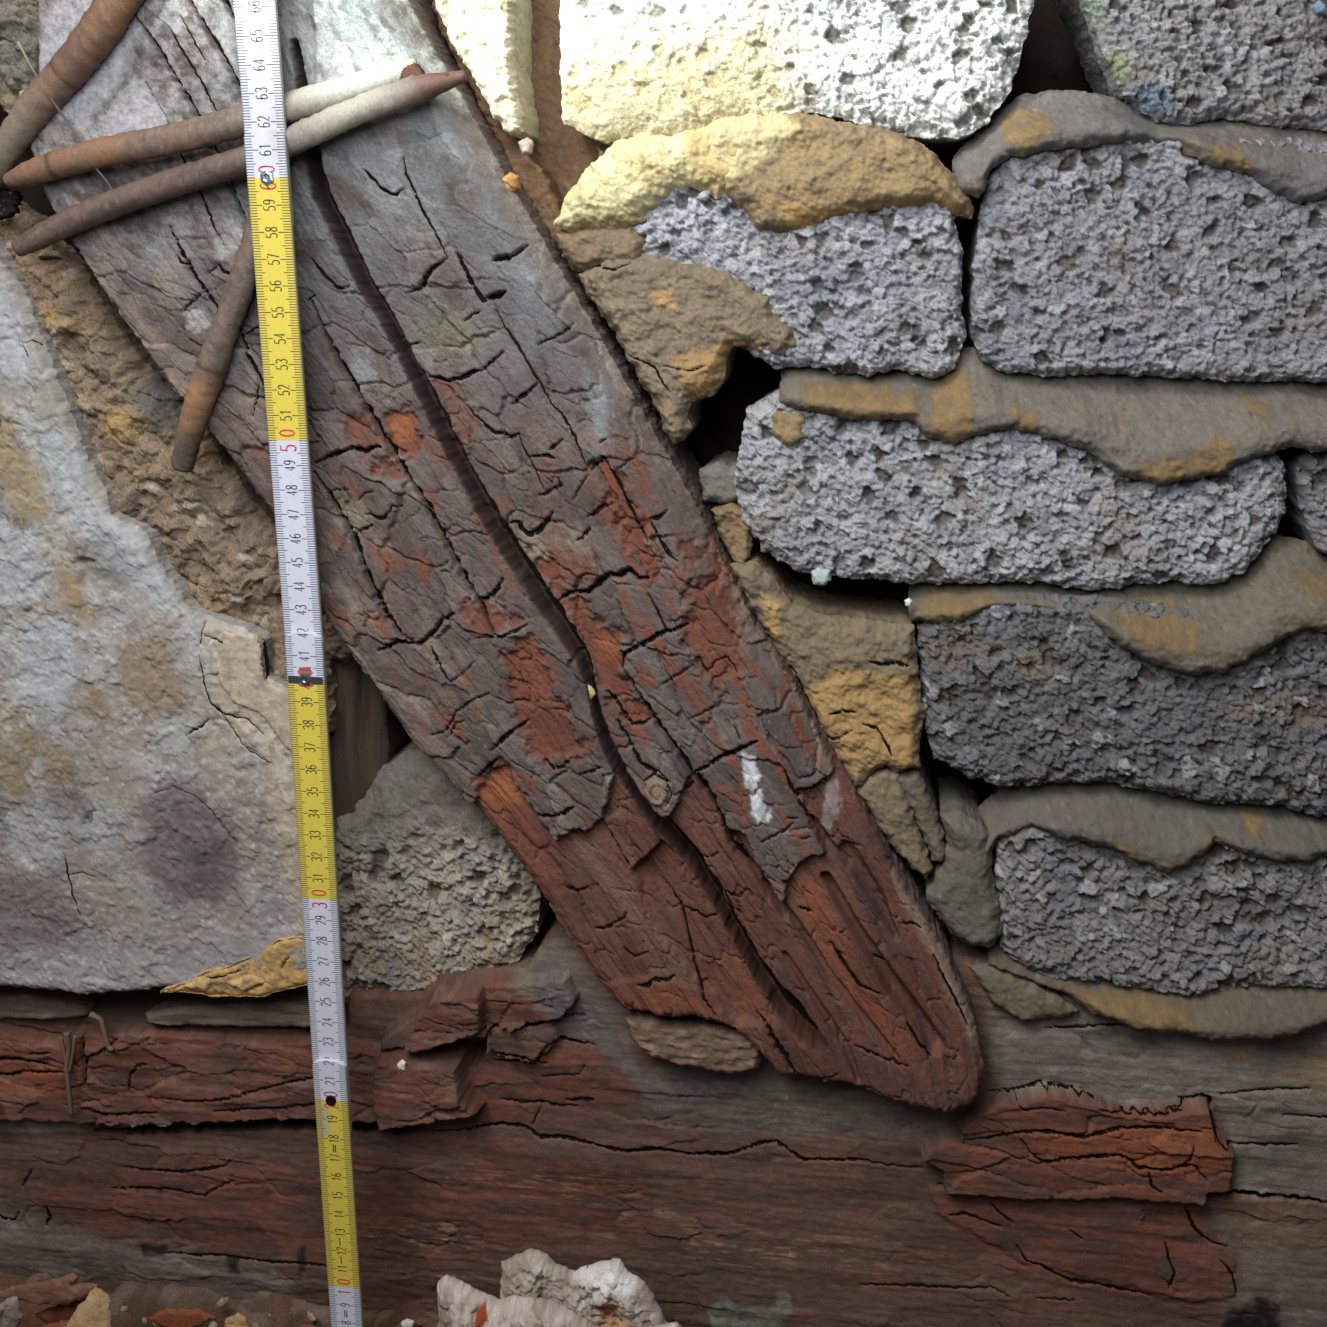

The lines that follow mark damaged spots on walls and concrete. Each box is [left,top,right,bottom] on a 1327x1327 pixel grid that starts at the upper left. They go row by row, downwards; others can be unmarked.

crack [186,621,272,763]
crack [65,858,96,916]
crack [421,1013,915,1167]